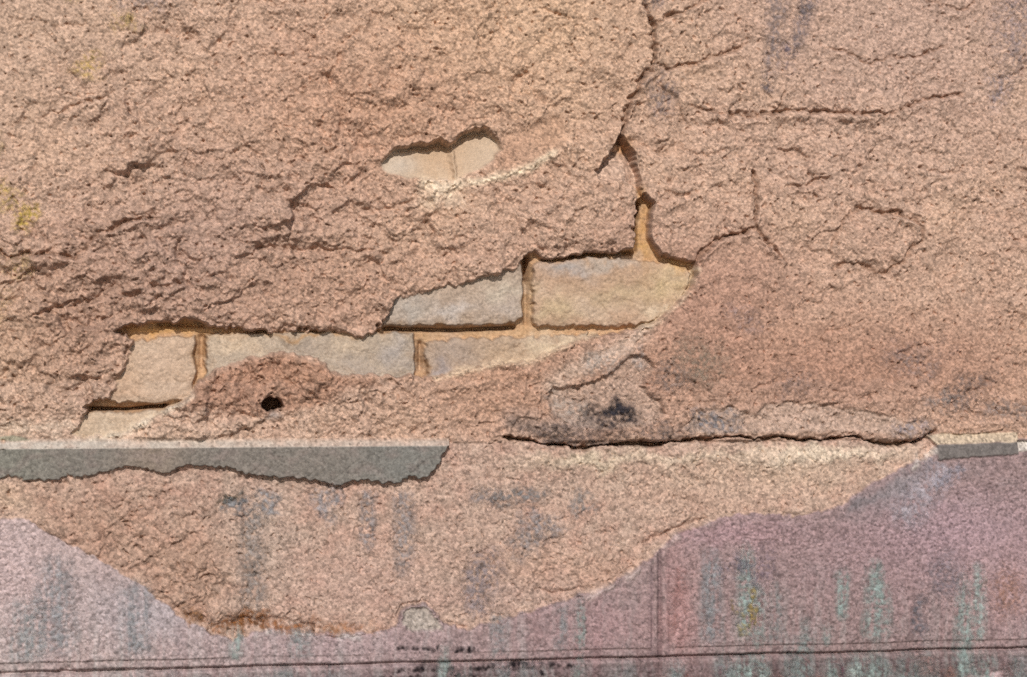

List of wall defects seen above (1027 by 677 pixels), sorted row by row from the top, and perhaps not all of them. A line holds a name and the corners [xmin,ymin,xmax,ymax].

crack [923,0,977,12]
crack [617,0,752,138]
crack [682,88,968,121]
crack [823,43,952,68]
crack [1014,164,1027,174]
crack [0,212,165,264]
crack [691,164,789,266]
crack [826,204,928,277]
flaking render [70,136,697,438]
flaking render [0,355,937,642]